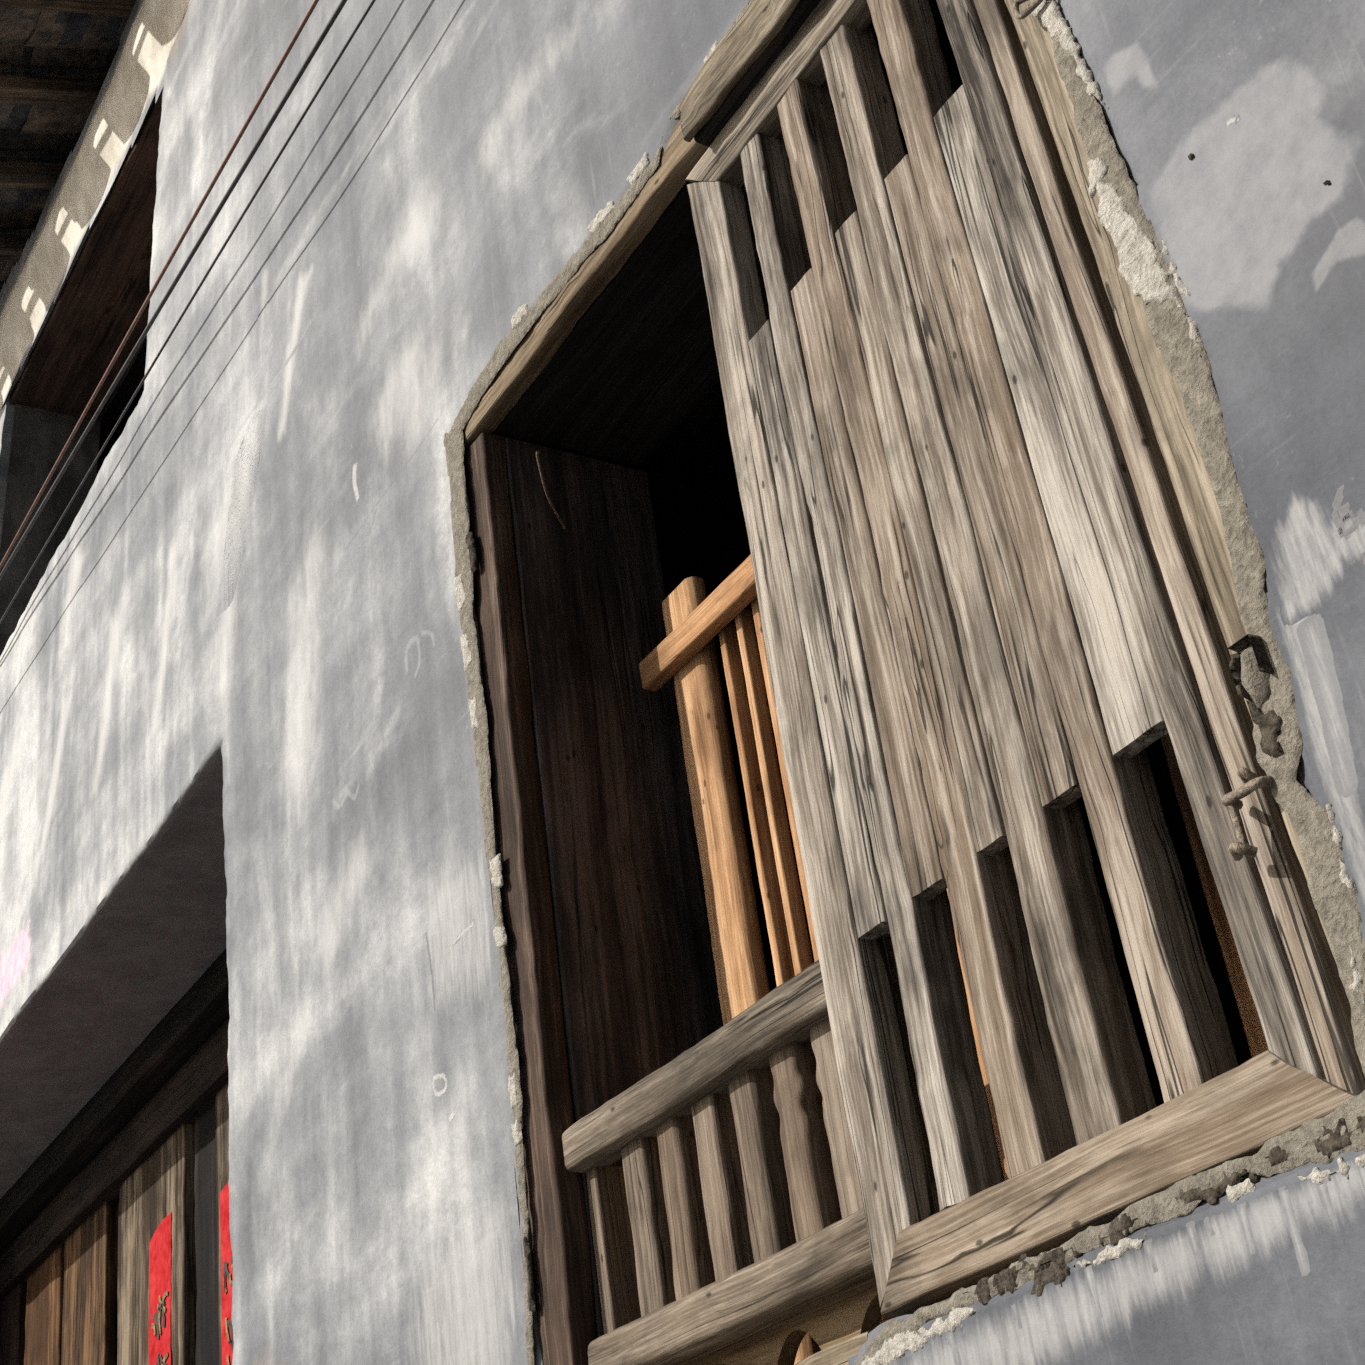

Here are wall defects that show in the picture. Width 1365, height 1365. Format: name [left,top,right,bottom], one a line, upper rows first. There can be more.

peeling [855,0,1365,1365]